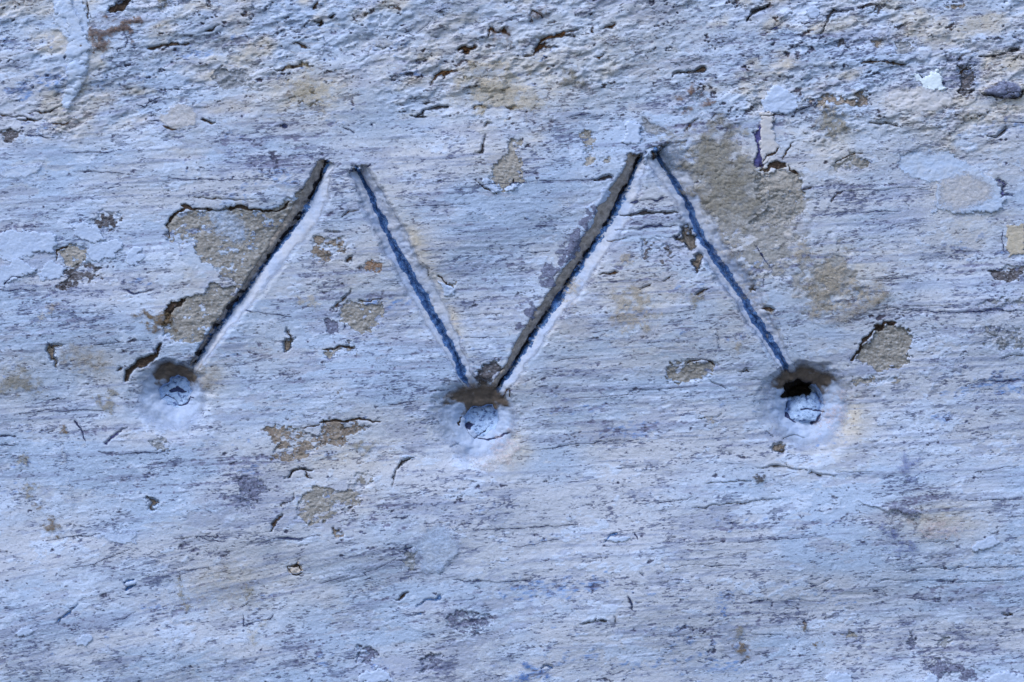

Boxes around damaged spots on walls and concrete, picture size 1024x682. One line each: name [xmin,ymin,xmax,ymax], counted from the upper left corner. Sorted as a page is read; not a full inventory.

spalling [478,139,525,194]
spalling [162,189,302,343]
spalling [322,299,384,359]
spalling [665,359,715,384]
spalling [850,321,913,386]
spalling [261,417,381,462]
spalling [297,474,373,538]